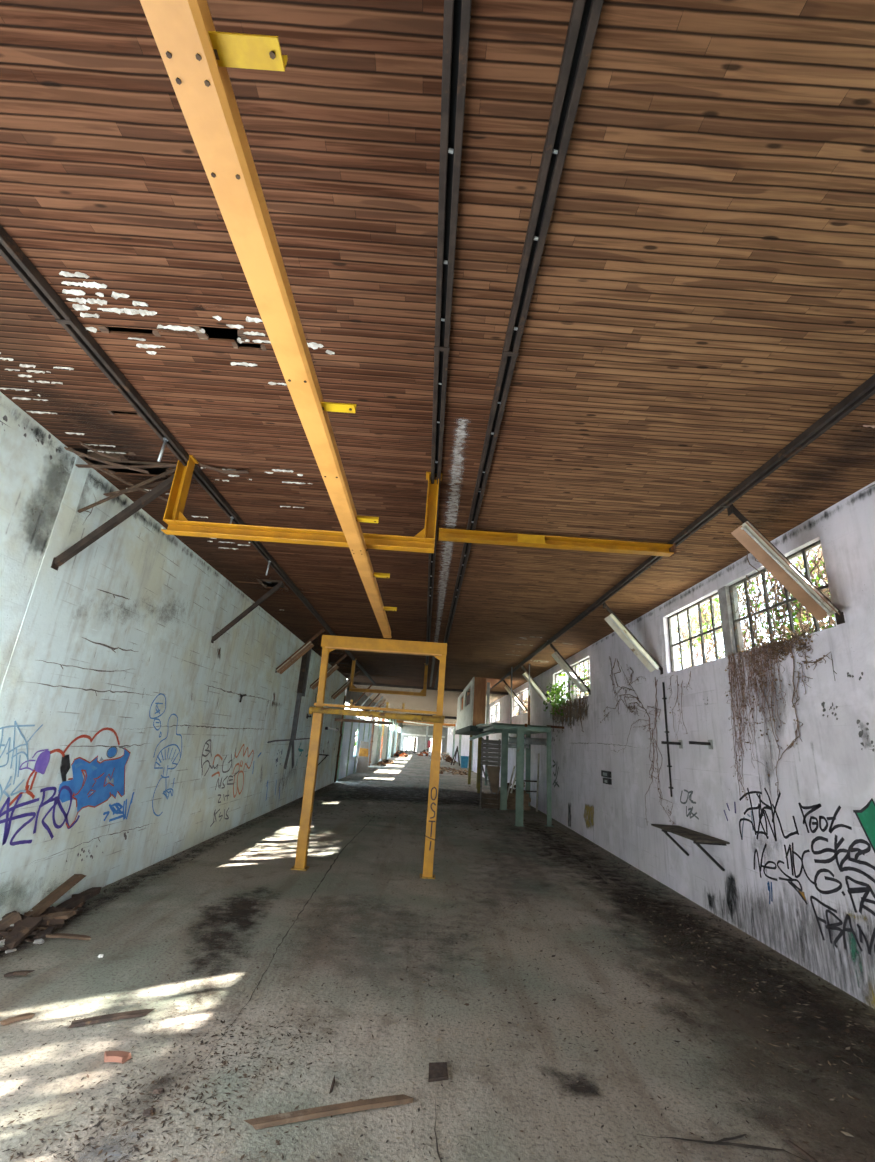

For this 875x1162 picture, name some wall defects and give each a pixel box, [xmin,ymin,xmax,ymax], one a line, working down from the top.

peeling [59,271,205,333]
peeling [128,338,165,355]
peeling [212,316,271,344]
peeling [0,352,74,414]
water stain [27,459,70,551]